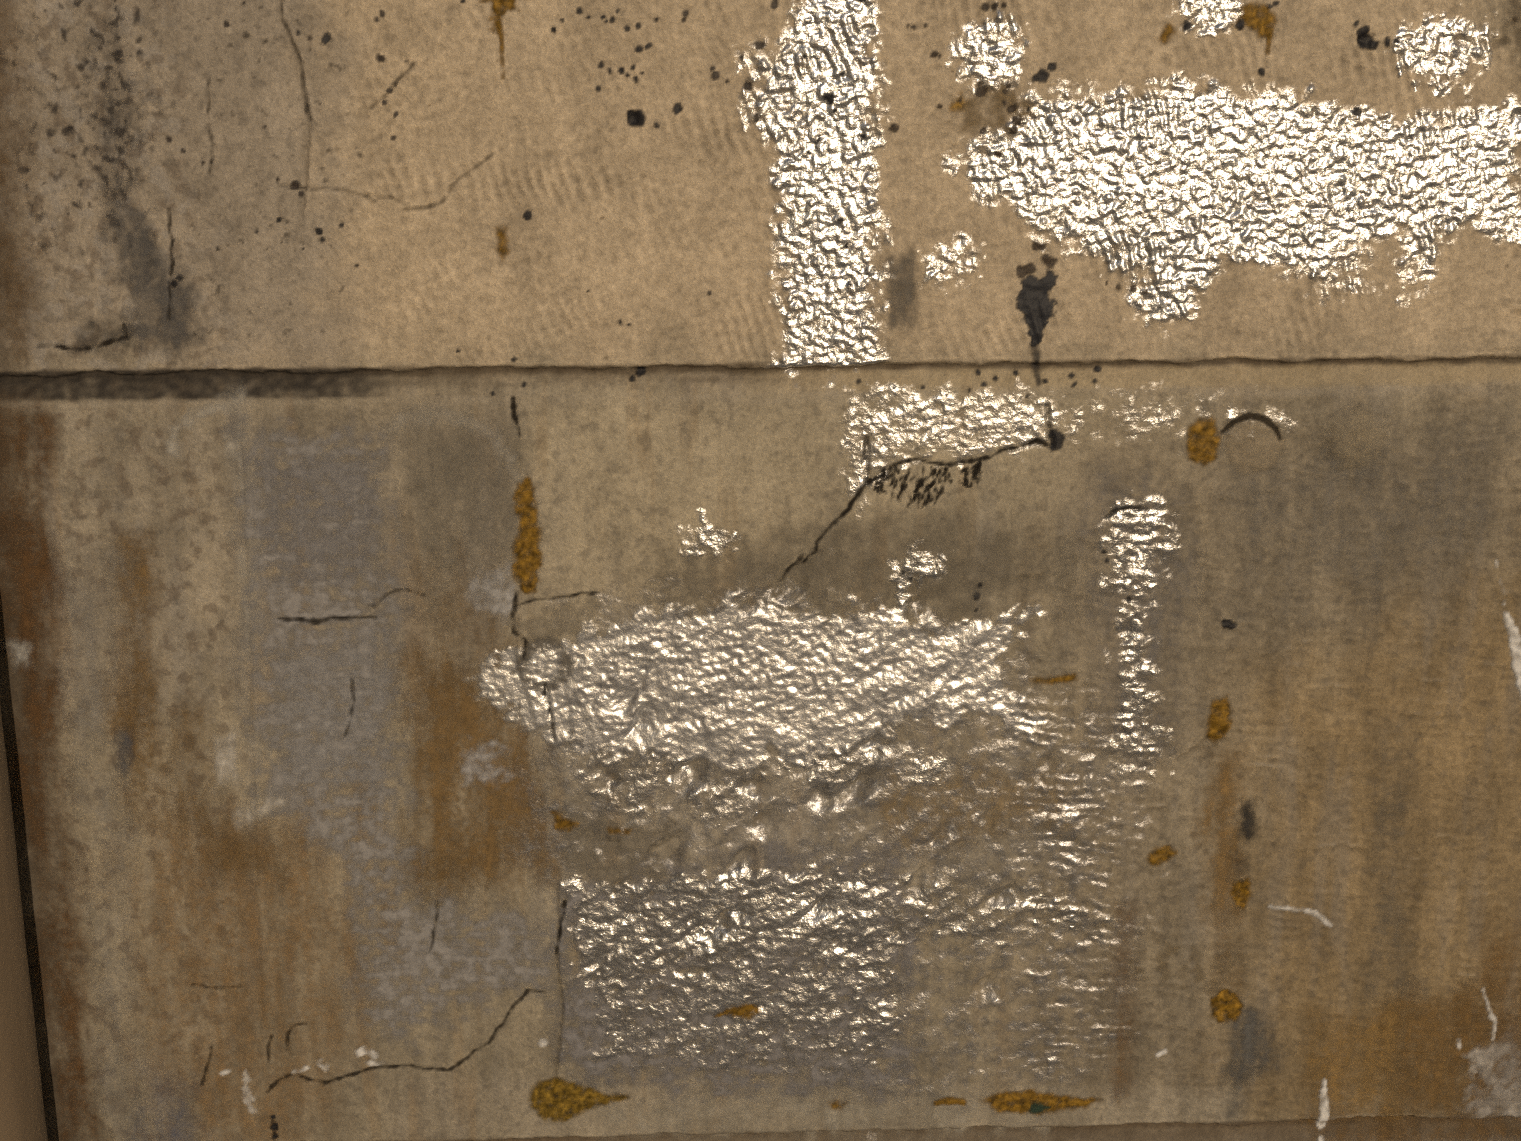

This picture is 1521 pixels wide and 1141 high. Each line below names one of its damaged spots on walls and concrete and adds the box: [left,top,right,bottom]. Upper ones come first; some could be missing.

water stain [78,8,141,90]
water stain [114,203,191,349]
crack [510,397,518,424]
crack [784,424,1051,575]
crack [511,595,553,730]
crack [268,989,529,1134]